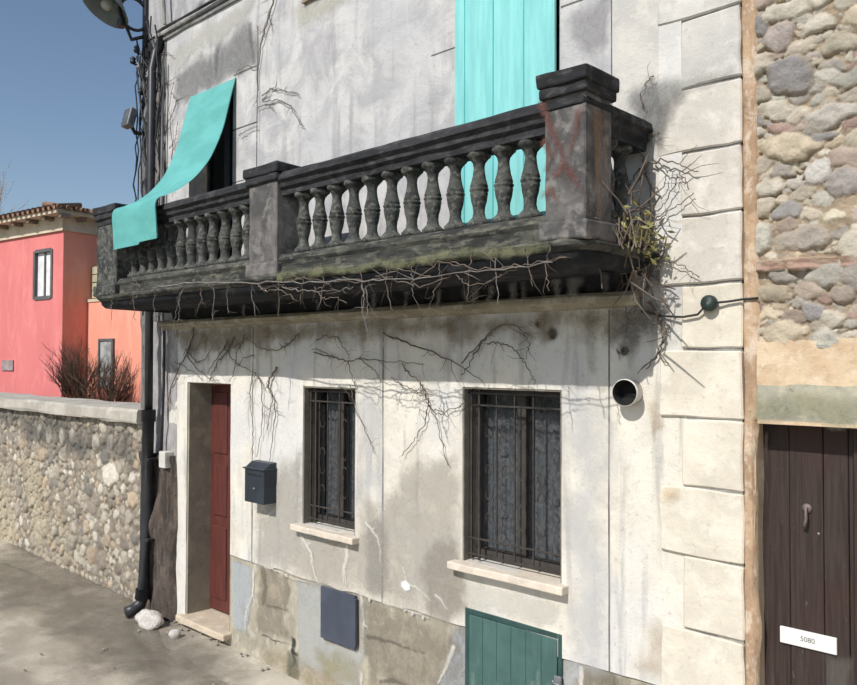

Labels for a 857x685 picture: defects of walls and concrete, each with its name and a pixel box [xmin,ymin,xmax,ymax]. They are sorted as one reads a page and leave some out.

leakage [260,462,463,618]
crack [577,667,585,685]